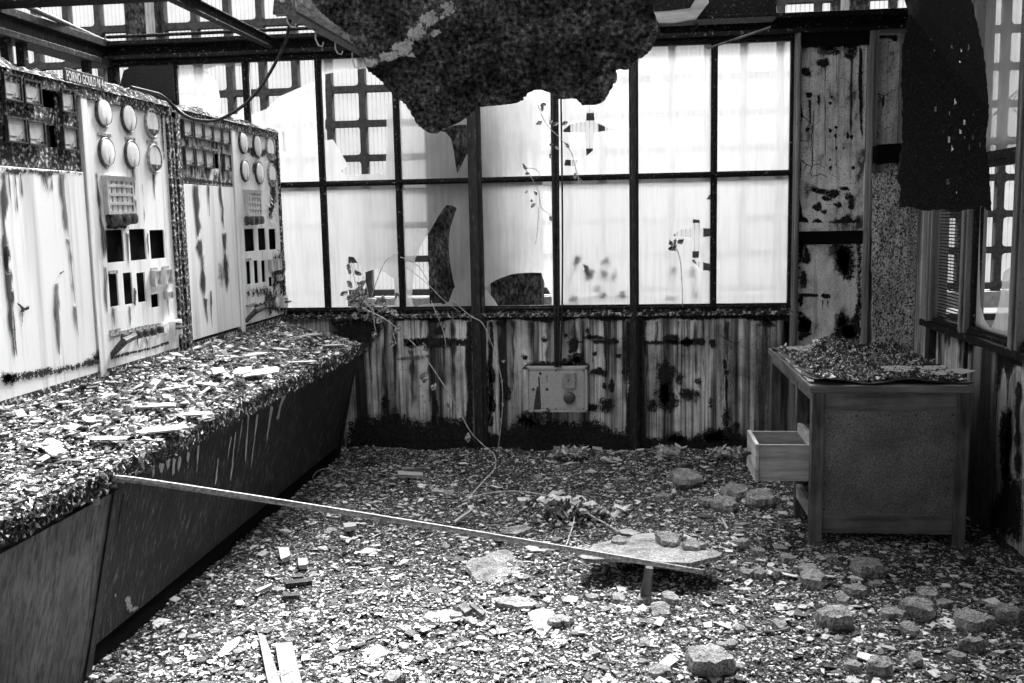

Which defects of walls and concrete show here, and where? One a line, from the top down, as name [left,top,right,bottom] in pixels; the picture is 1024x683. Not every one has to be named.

damp [799,45,863,224]
damp [485,245,813,451]
damp [831,244,863,343]
damp [991,354,1023,544]